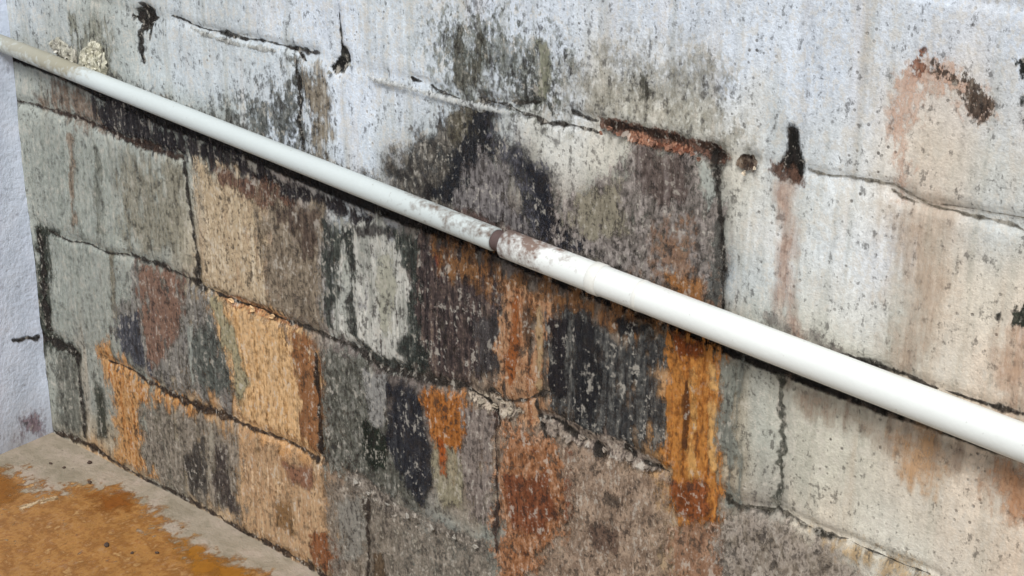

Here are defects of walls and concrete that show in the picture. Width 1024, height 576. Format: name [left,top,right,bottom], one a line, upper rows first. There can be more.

peeling [49,37,109,75]
crack [132,1,344,150]
crack [411,76,599,134]
water stain [360,2,744,309]
corrosion [886,47,995,195]
crack [11,100,670,576]
corrosion [418,386,472,510]
spalling [468,390,525,420]
water stain [13,53,1001,521]
corrosion [431,236,729,576]
spalling [540,409,662,471]
crack [723,372,931,575]